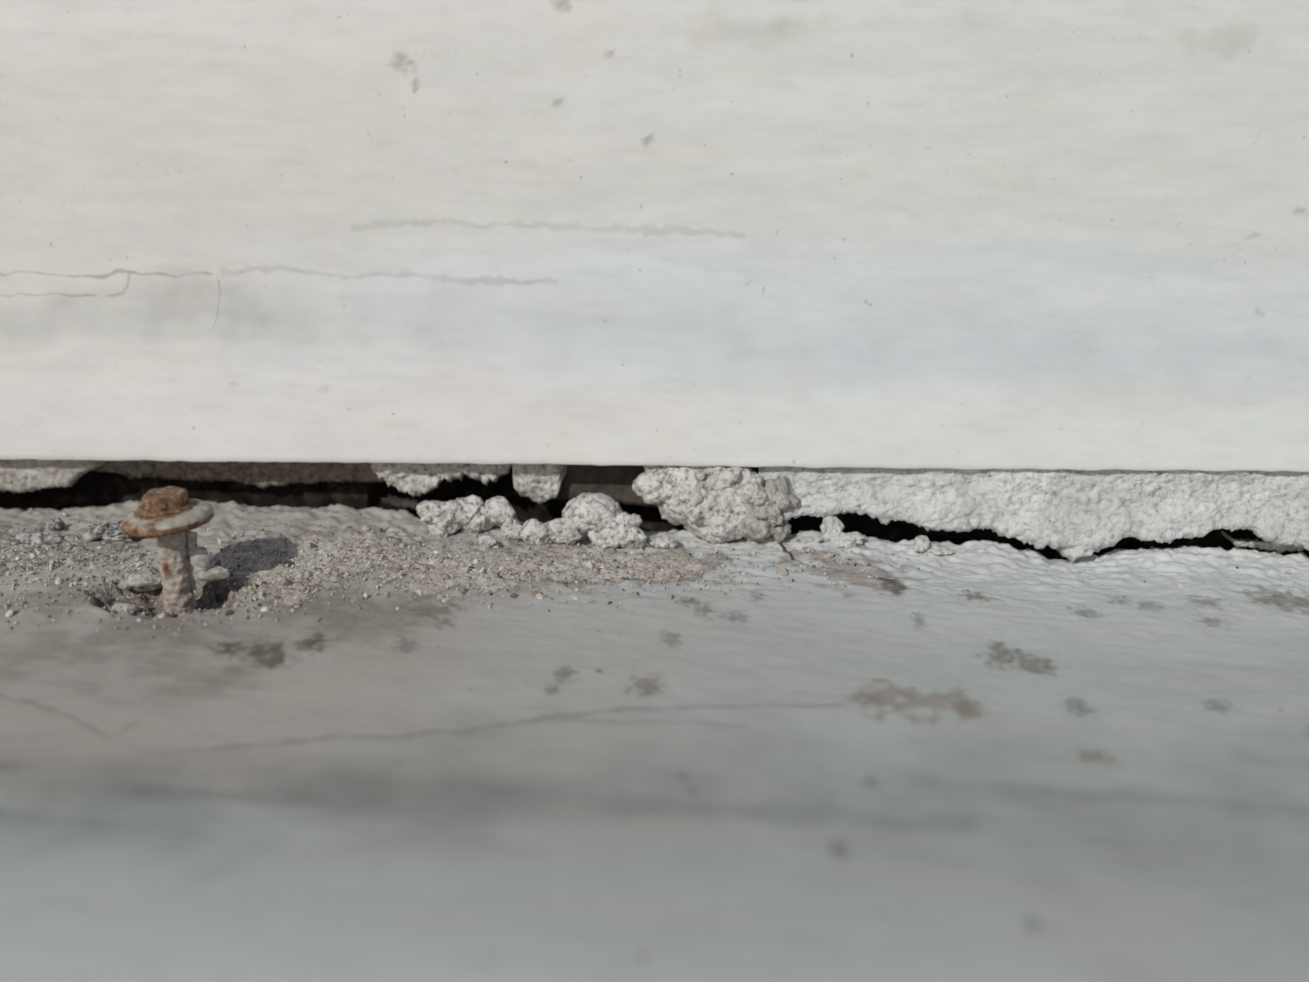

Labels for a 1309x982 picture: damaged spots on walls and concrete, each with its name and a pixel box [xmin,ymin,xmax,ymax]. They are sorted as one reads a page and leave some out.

spalling [751,467,1309,562]